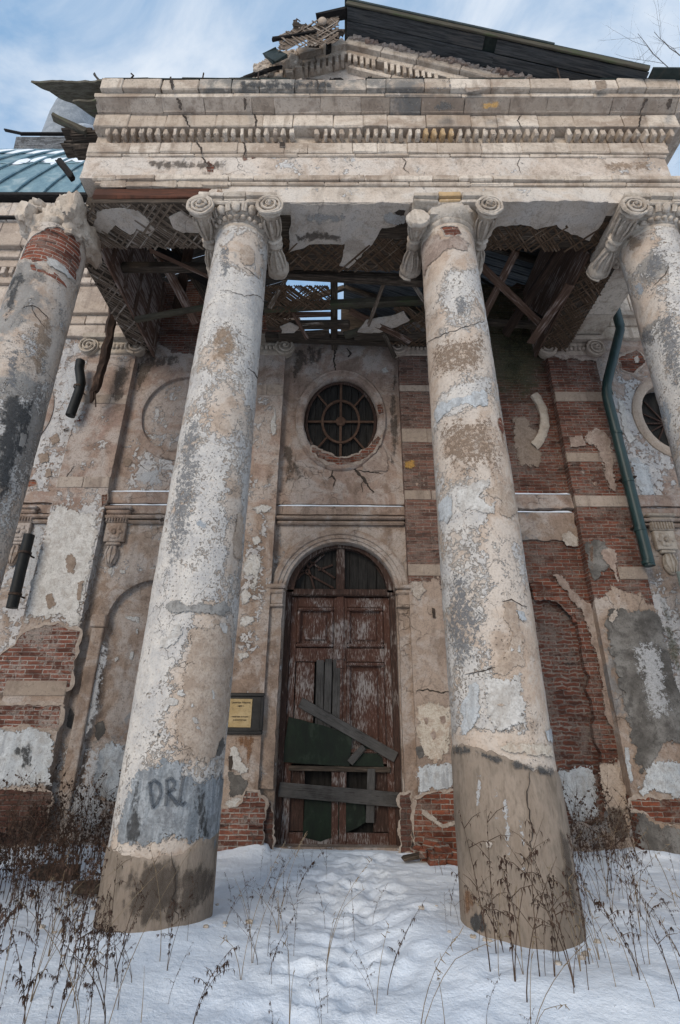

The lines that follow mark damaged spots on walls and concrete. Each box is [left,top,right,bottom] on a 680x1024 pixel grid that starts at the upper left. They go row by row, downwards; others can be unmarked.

crack [169,77,210,166]
flaking render [20,226,82,288]
flaking render [617,349,646,375]
damp [0,350,32,498]
crack [328,469,381,493]
peeling [434,389,518,523]
peeling [512,415,542,467]
peeling [569,428,655,495]
peeling [618,400,637,444]
peeling [0,493,108,848]
efflorescence [632,641,672,719]
peeling [93,589,276,851]